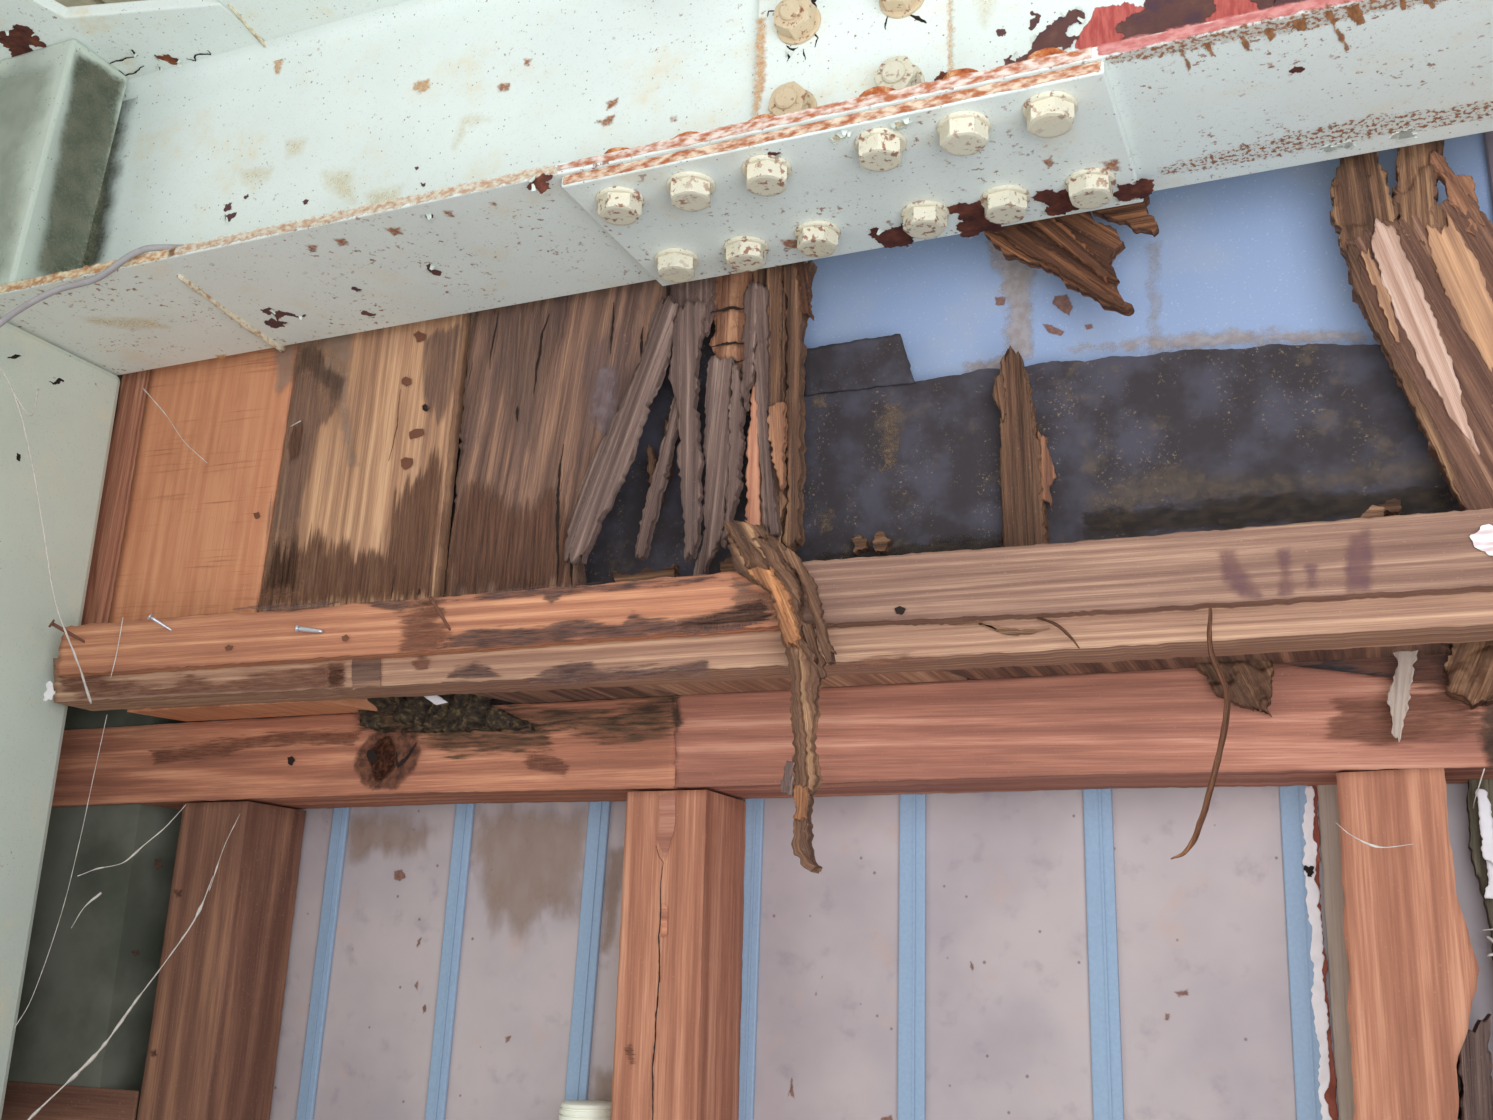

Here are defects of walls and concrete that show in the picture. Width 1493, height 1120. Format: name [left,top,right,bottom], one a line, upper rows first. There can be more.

peeling [1004,0,1307,65]
rust [0,0,1493,293]
leakage [482,307,563,455]
leakage [236,325,776,678]
peeling [1469,524,1493,556]
leakage [149,661,708,773]
leakage [483,813,579,927]
leakage [605,852,624,944]
crack [652,847,664,1120]